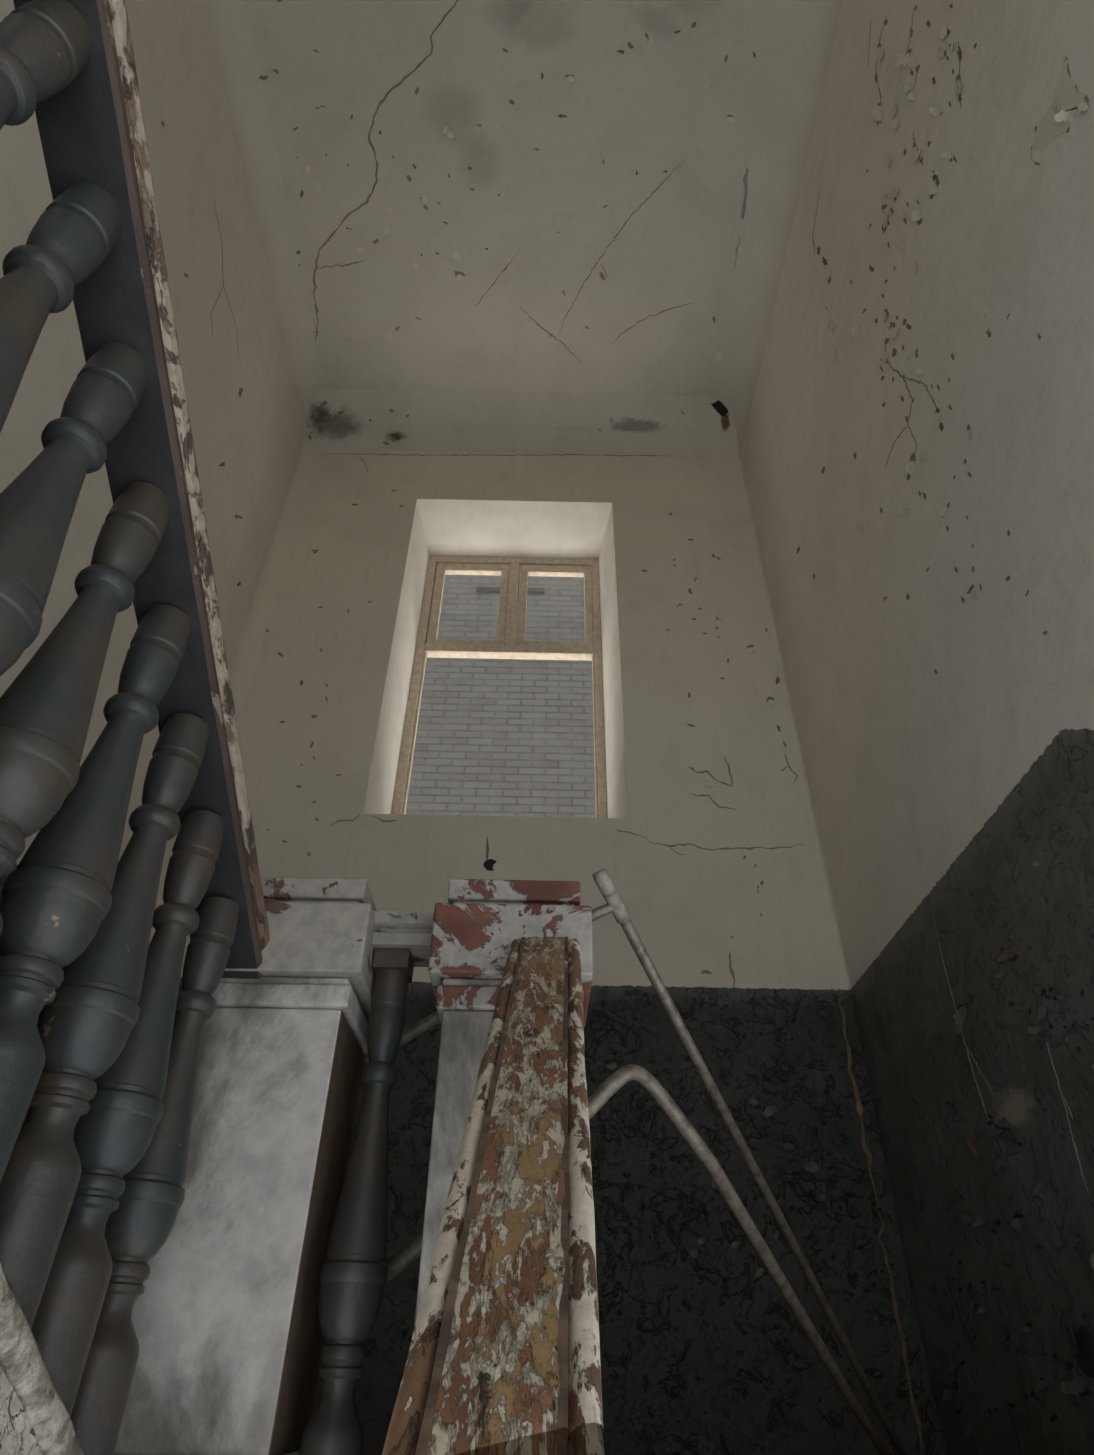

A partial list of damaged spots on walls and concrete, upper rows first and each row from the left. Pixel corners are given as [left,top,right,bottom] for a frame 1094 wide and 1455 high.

crack [184,199,243,397]
crack [313,0,458,344]
crack [475,252,519,307]
crack [521,161,692,363]
crack [885,344,938,468]